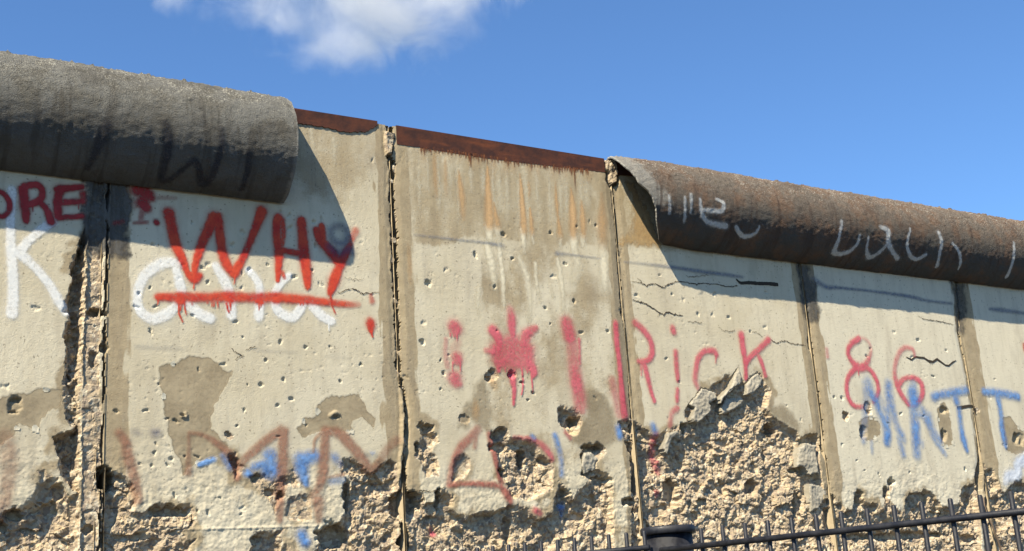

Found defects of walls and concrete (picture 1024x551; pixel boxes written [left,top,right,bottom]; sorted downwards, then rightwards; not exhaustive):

rust [420,147,588,237]
crack [633,274,806,346]
spalling [0,225,86,551]
peeling [159,356,314,551]
peeling [297,394,375,437]
spalling [313,367,1024,551]
crack [907,356,956,366]
spalling [96,467,198,551]